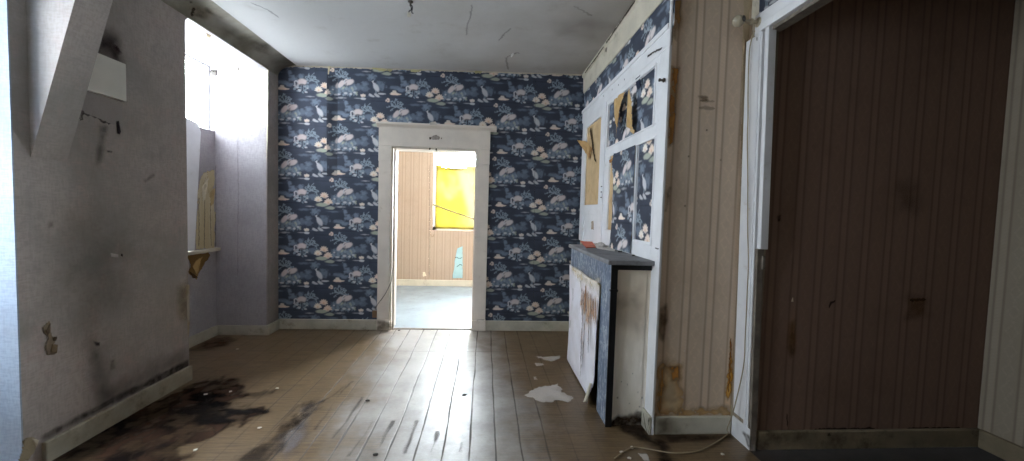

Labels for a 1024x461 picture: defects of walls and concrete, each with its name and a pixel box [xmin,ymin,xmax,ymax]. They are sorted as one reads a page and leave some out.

water stain [45,363,188,437]